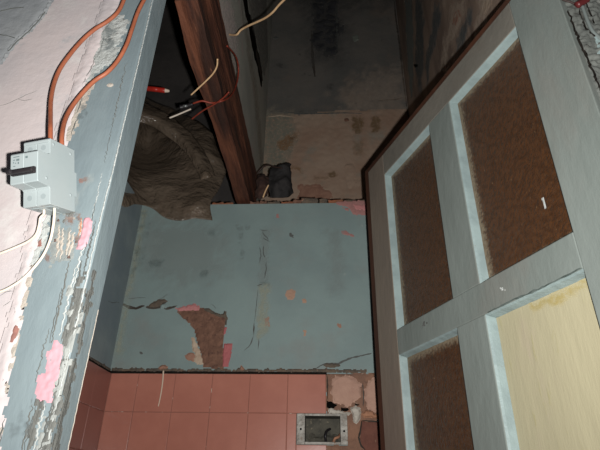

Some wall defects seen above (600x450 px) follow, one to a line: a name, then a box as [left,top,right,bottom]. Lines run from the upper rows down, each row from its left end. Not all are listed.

flaking render [250,109,408,215]
peeling [0,0,380,450]
crack [109,295,176,310]
crack [316,353,371,369]